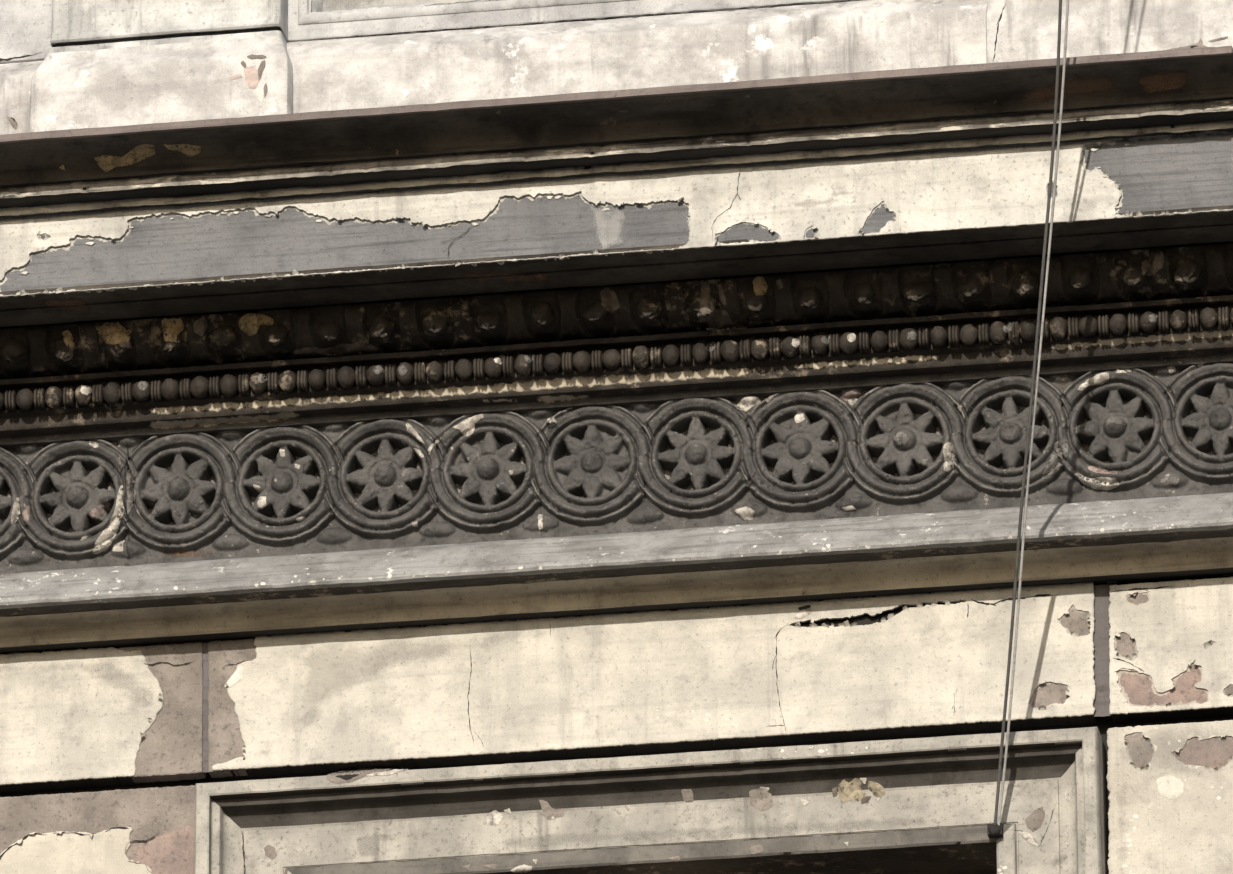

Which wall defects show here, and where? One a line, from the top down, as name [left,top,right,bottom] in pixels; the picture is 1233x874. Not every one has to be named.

peeling [1080,131,1233,216]
peeling [0,192,691,296]
peeling [714,222,781,245]
peeling [859,201,897,236]
peeling [1058,605,1091,637]
crack [767,625,787,730]
peeling [1029,682,1070,710]
peeling [1114,632,1216,708]
peeling [0,639,257,874]
spalling [832,778,885,804]
peeling [1124,733,1184,799]
peeling [1172,735,1233,771]